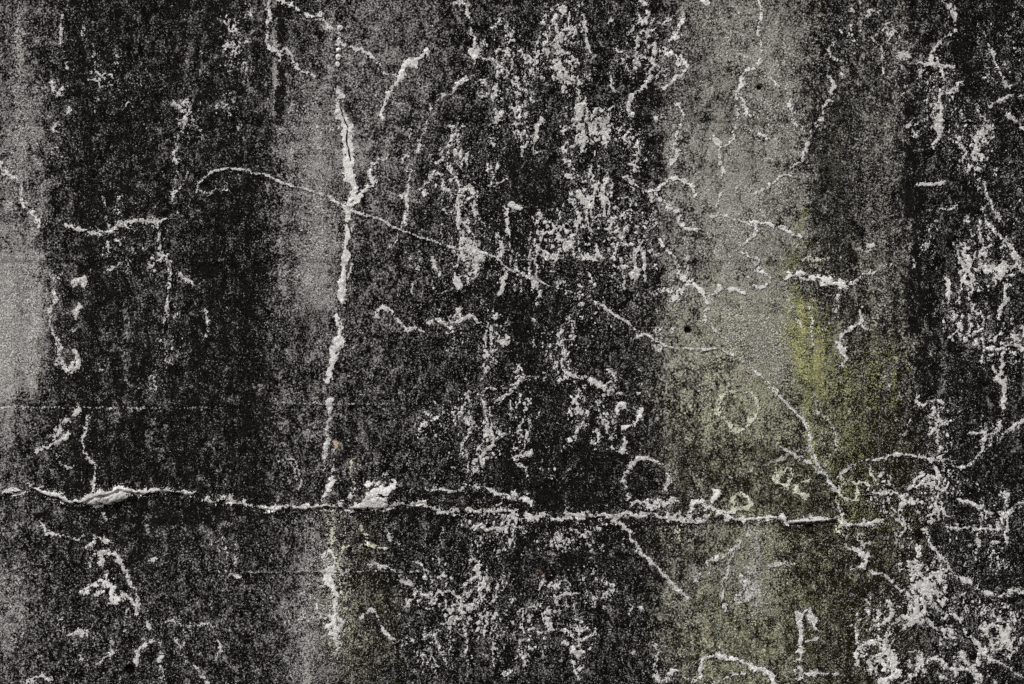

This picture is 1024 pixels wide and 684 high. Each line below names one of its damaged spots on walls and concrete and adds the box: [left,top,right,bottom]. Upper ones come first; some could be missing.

crack [642,0,845,346]
water stain [0,0,358,684]
crack [0,87,1024,625]
water stain [370,0,1024,618]
crack [118,560,210,684]
crack [359,607,415,643]
water stain [651,642,661,684]
crack [868,570,1024,678]
water stain [899,651,997,684]